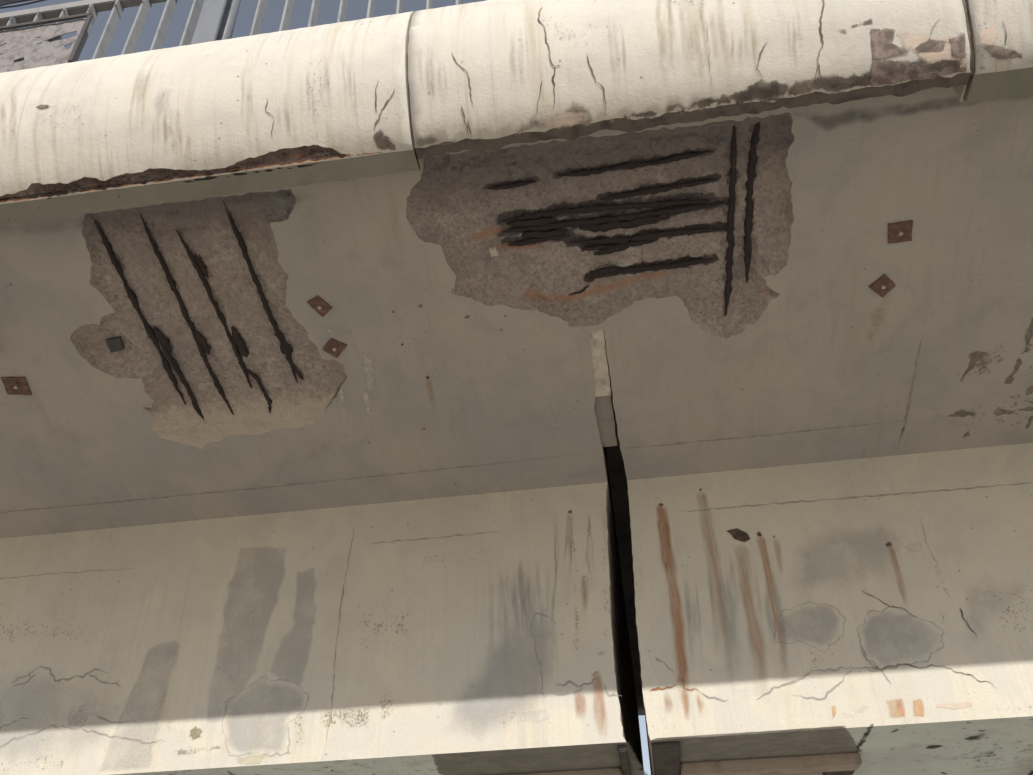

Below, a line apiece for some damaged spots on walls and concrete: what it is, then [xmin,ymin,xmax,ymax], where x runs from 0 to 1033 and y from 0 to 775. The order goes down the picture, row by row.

crack [537,9,561,115]
crack [587,54,606,115]
crack [814,0,825,84]
peeling [841,19,966,86]
spalling [0,145,383,203]
spalling [406,112,794,339]
spalling [70,189,348,449]
corrosion [658,503,700,712]
corrosion [742,568,762,662]
corrosion [757,532,781,640]
crack [756,647,996,700]
water stain [176,727,221,754]